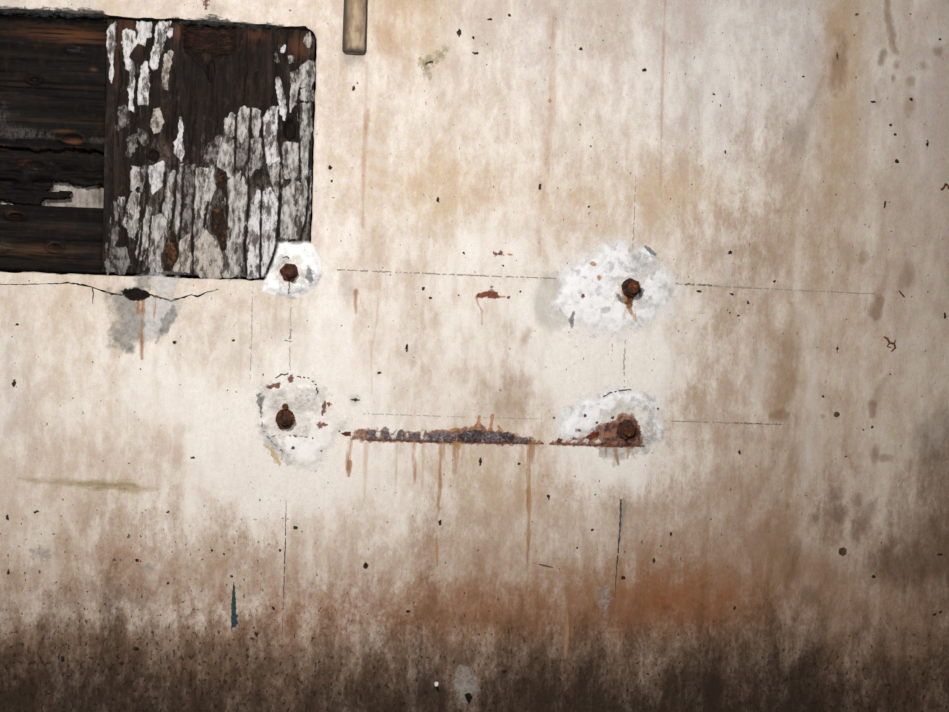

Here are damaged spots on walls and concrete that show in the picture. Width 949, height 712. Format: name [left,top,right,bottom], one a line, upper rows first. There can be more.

peeling [104,21,316,359]
crack [1,282,124,303]
crack [150,289,218,302]
rust [476,286,510,302]
rust [622,291,633,314]
rust [339,413,644,500]